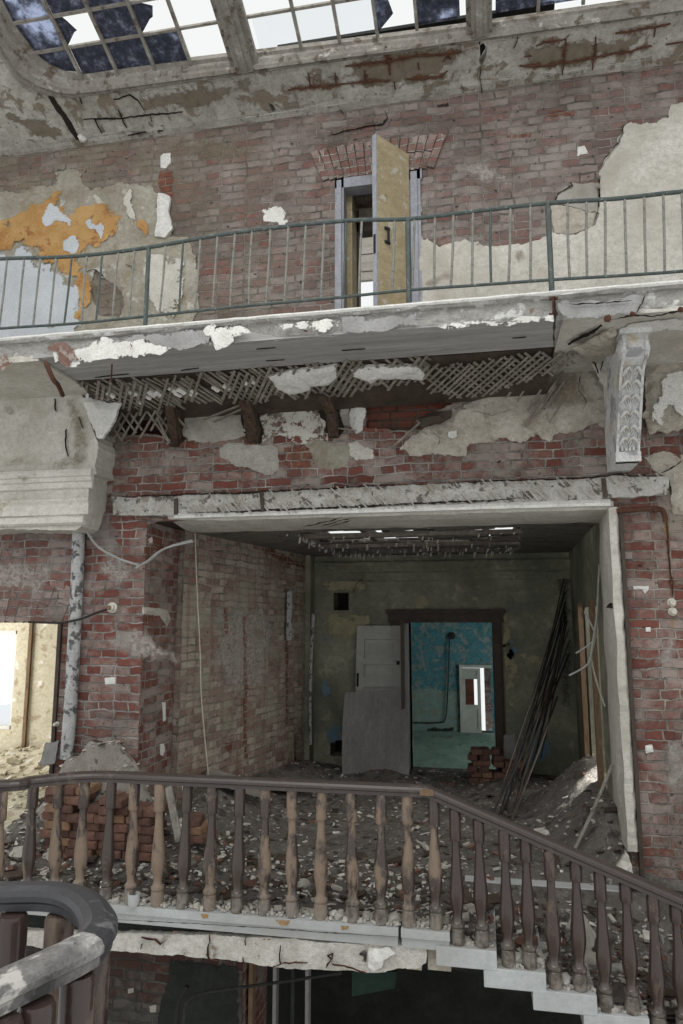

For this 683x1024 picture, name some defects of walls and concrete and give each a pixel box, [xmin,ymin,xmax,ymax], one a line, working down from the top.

crack [38,93,183,140]
crack [332,110,388,135]
spalling [158,170,173,196]
crack [553,295,678,345]
spalling [111,330,211,351]
spalling [282,444,312,470]
crack [140,935,246,964]
crack [273,945,367,974]